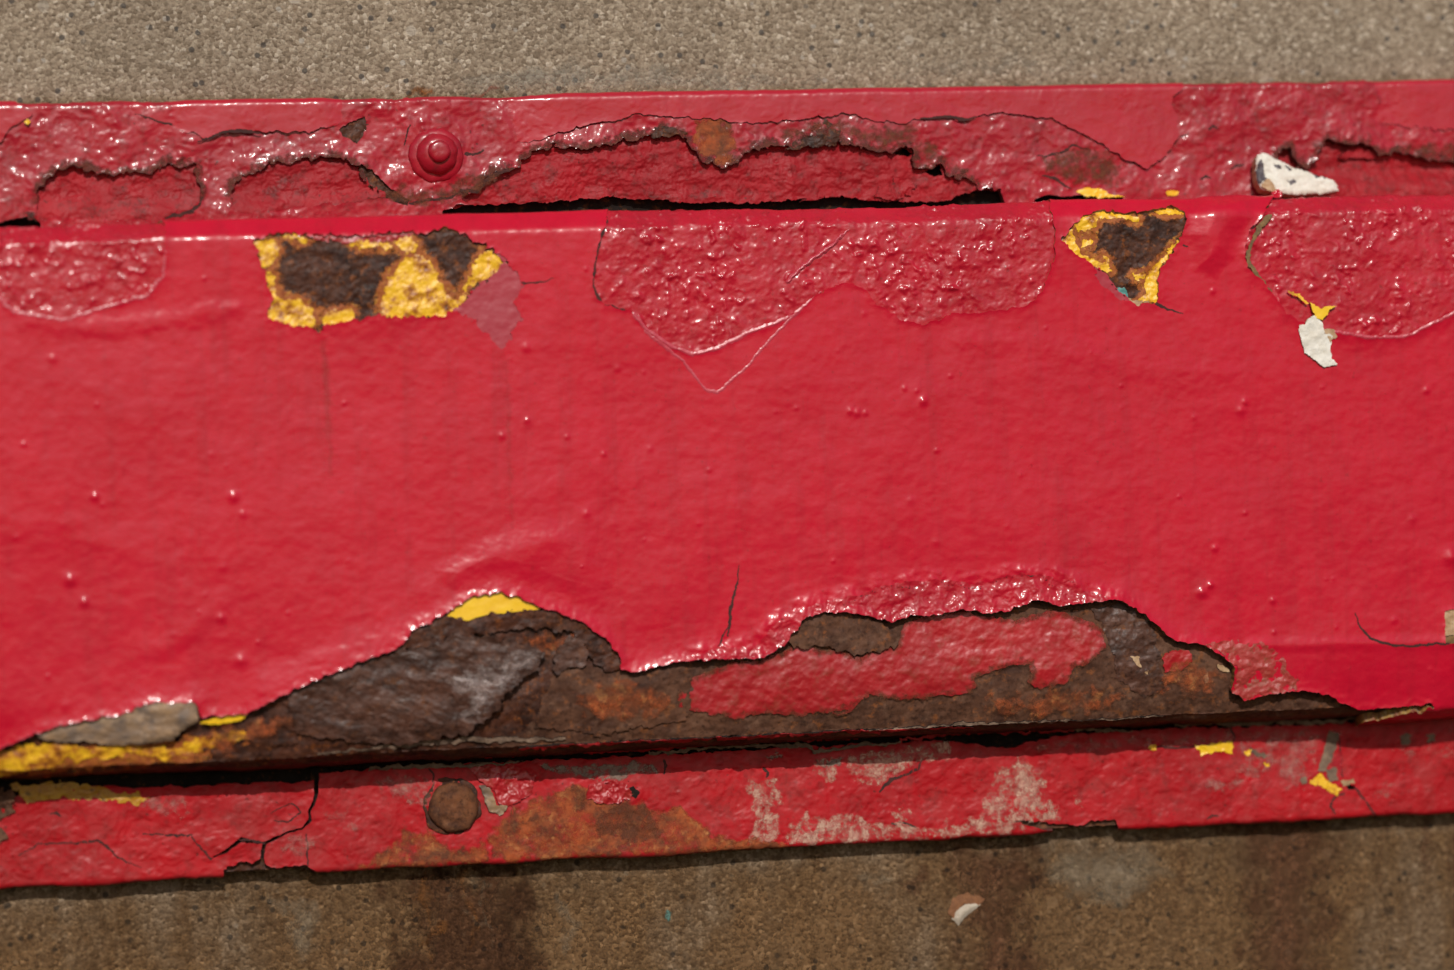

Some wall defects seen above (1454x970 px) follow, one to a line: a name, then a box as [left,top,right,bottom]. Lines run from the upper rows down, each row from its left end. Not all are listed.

peeling [27,155,206,222]
peeling [225,117,408,214]
peeling [452,119,1002,210]
peeling [1272,134,1454,199]
peeling [253,229,524,349]
peeling [1061,207,1187,306]
peeling [1287,290,1337,367]
peeling [1444,609,1454,643]
peeling [0,572,1397,816]
crack [18,768,321,868]
peeling [749,762,1116,845]
rust [260,784,783,970]